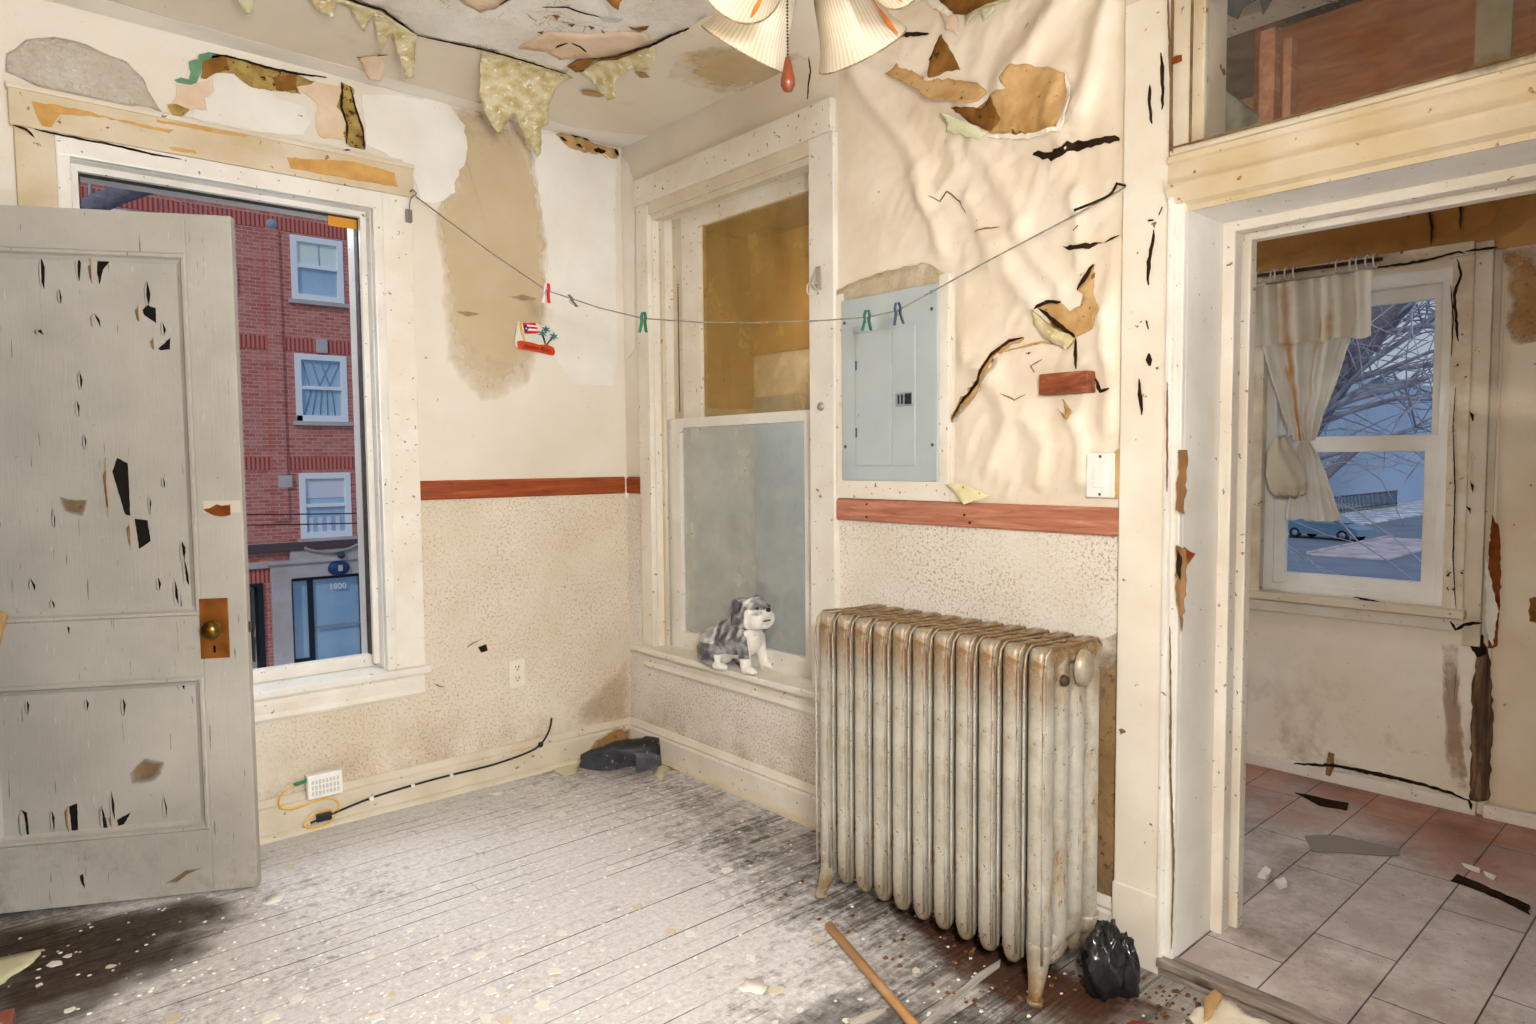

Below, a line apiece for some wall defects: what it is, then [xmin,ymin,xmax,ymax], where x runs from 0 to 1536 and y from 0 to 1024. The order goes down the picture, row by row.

crack [350,0,690,74]
peeling [32,0,716,188]
crack [929,191,998,232]
crack [1000,359,1042,401]
spalling [1466,450,1474,514]
peeling [1485,514,1501,648]
spalling [1528,597,1536,623]